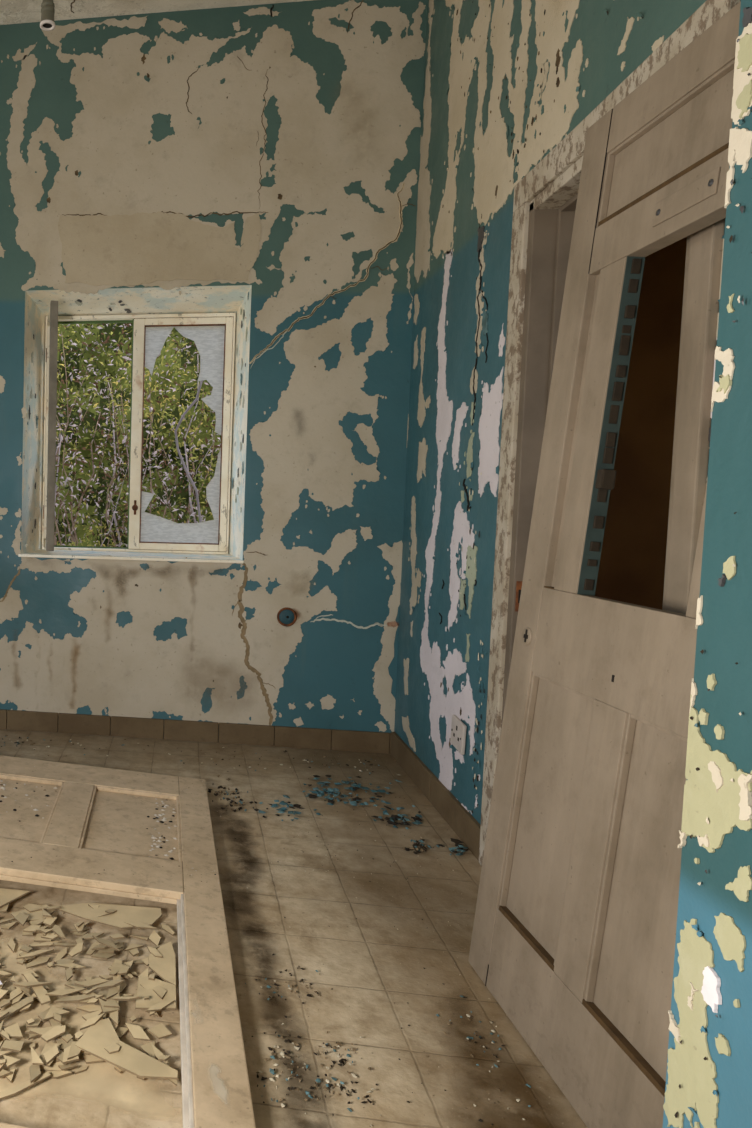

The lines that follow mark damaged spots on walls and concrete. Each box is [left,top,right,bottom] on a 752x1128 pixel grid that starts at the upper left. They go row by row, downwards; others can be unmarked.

peeling [617,17,641,71]
peeling [724,7,752,208]
peeling [0,0,589,814]
peeling [708,235,735,448]
crack [232,551,276,726]
peeling [695,595,703,629]
peeling [718,556,736,587]
peeling [436,838,469,856]
peeling [678,674,752,864]
peeling [725,865,752,902]
peeling [663,913,746,1128]